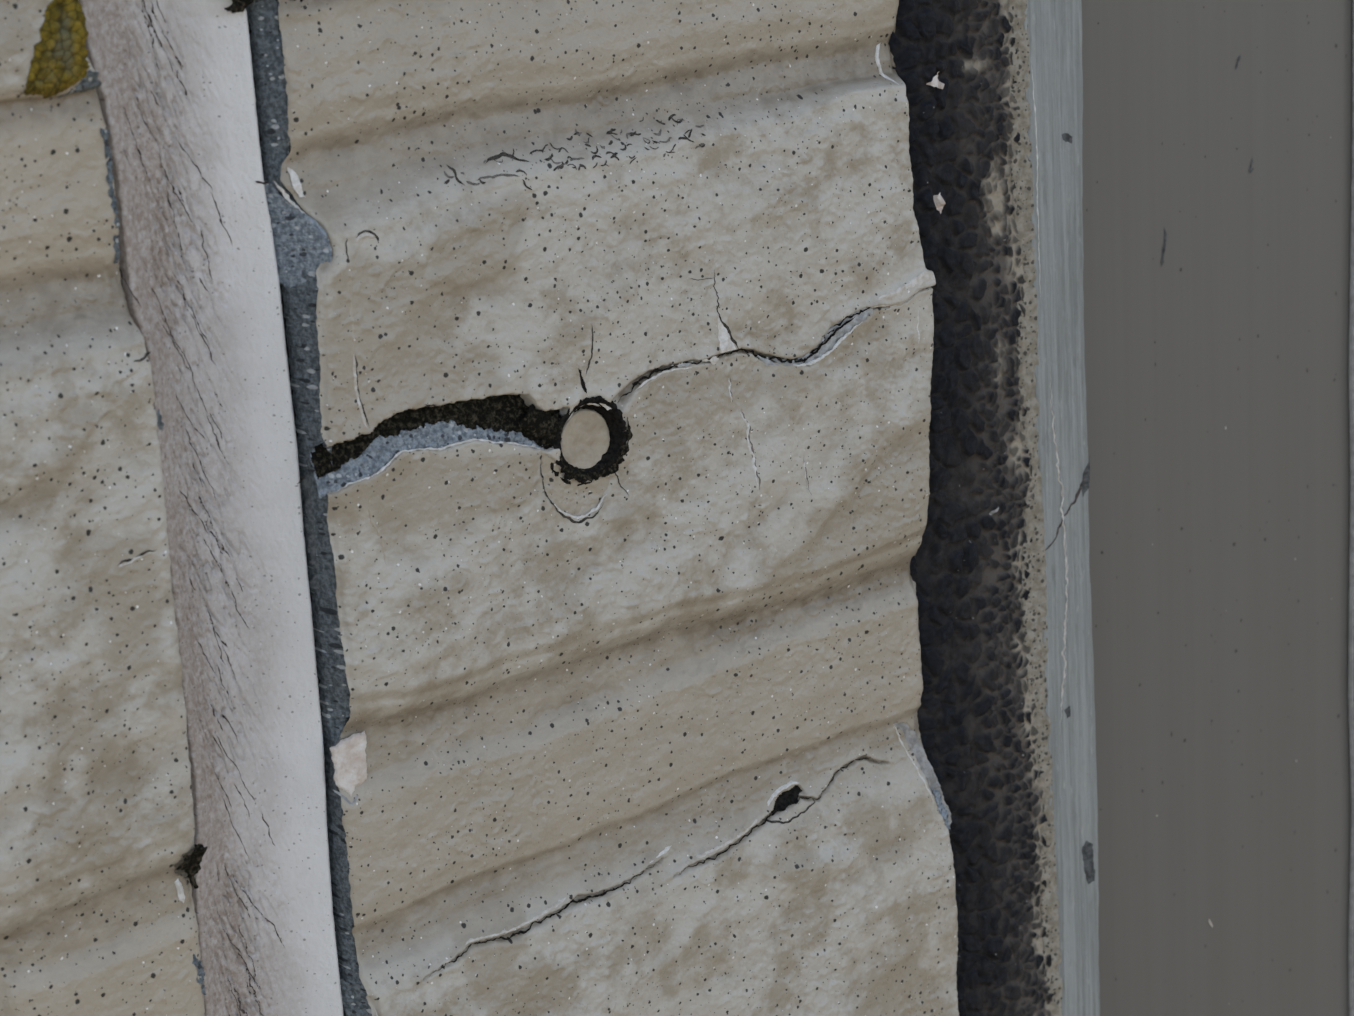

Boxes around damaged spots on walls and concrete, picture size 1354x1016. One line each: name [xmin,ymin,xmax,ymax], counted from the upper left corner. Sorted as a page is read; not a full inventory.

crack [444,114,706,190]
crack [280,270,936,523]
crack [433,758,876,973]